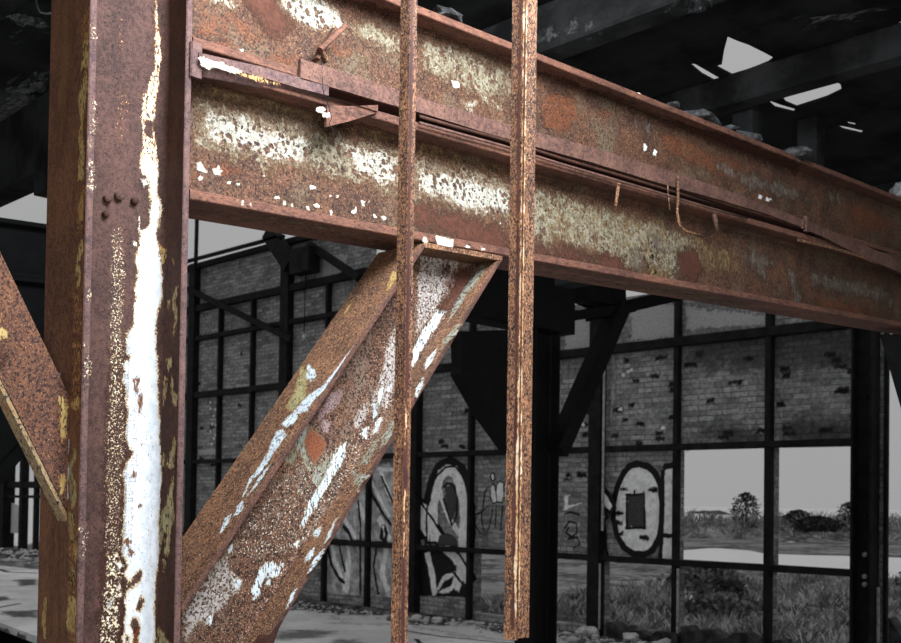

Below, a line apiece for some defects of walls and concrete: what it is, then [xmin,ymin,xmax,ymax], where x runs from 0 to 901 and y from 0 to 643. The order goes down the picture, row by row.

peeling [198,56,281,86]
rust [195,0,299,49]
peeling [196,161,239,185]
rust [540,72,800,177]
peeling [99,0,179,643]
peeling [423,235,453,247]
peeling [412,256,486,397]
rust [414,0,523,630]
rust [534,243,632,271]
rust [673,242,705,283]
rust [96,347,143,643]
peeling [181,325,407,643]